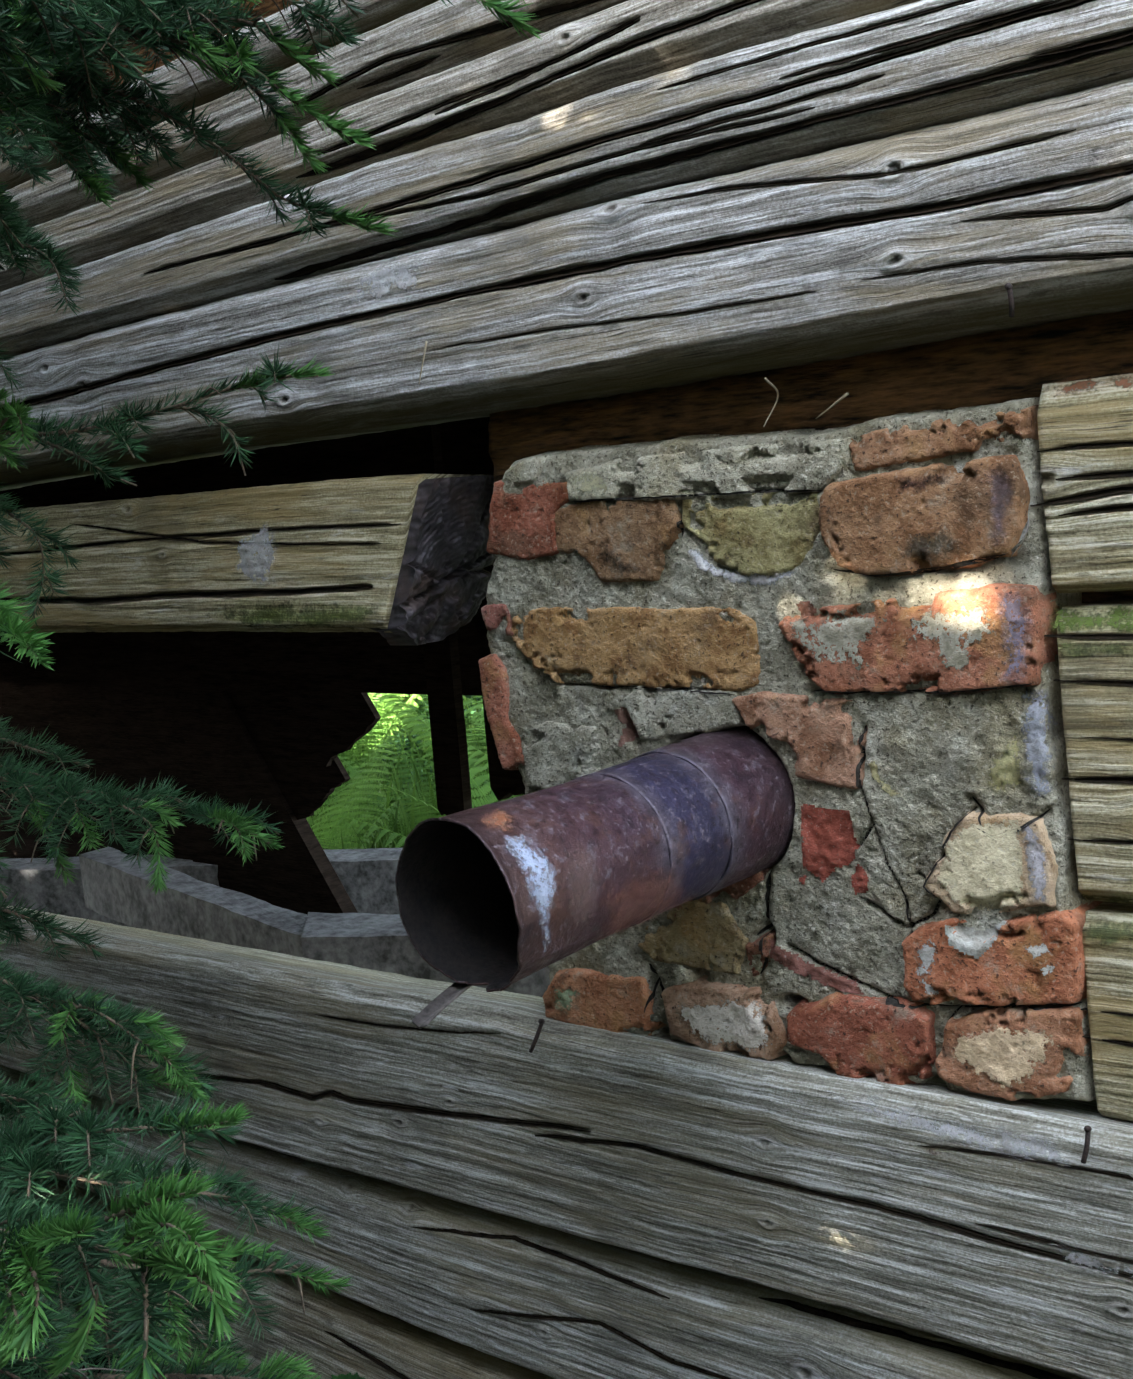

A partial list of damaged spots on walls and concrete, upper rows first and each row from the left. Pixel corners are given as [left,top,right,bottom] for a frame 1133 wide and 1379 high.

crack [144,0,1133,280]
crack [0,164,1133,410]
peeling [784,601,887,671]
peeling [906,598,995,670]
rust [487,810,513,830]
crack [814,679,1133,933]
peeling [915,819,1024,995]
peeling [1025,943,1057,976]
crack [200,1074,1133,1280]
crack [412,1227,670,1299]
crack [470,1309,731,1379]
crack [759,1297,1068,1379]